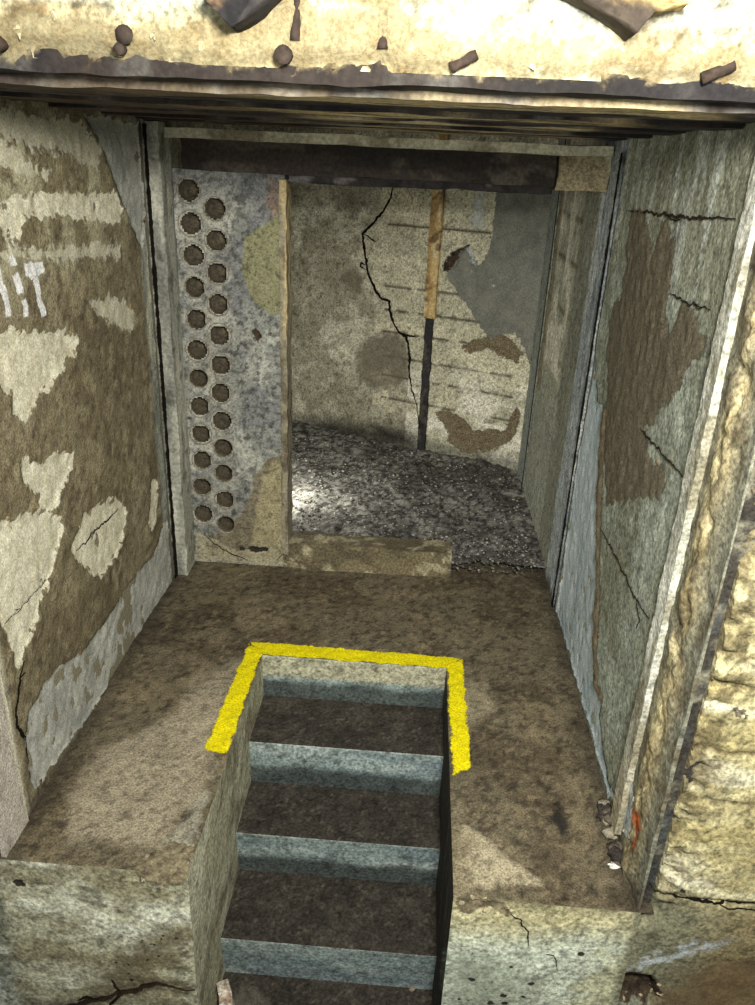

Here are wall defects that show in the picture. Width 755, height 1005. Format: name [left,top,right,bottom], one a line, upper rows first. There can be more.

peeling [0,107,146,265]
crack [628,209,735,222]
peeling [90,291,135,332]
crack [360,188,419,419]
peeling [0,325,79,424]
spalling [435,406,521,454]
peeling [0,448,128,670]
crack [601,530,649,628]
peeling [25,478,175,790]
corrosion [632,807,641,848]
crack [648,883,755,911]
crack [69,979,195,1005]